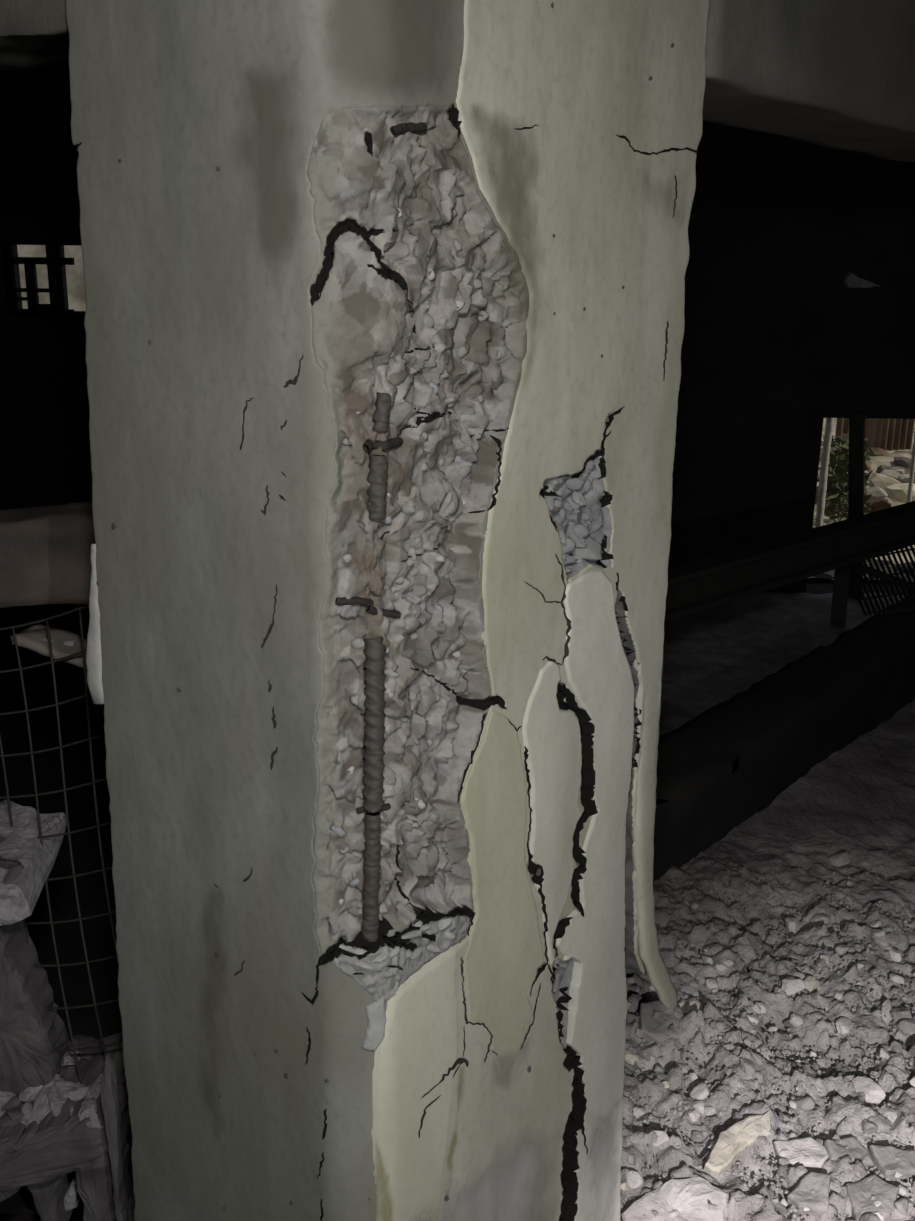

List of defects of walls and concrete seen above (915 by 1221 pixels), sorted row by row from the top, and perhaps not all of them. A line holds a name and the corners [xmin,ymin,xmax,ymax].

crack [617,135,697,217]
crack [310,218,435,353]
crack [662,321,670,381]
spalling [542,456,612,579]
spalling [307,106,582,1221]
crack [302,401,642,1221]